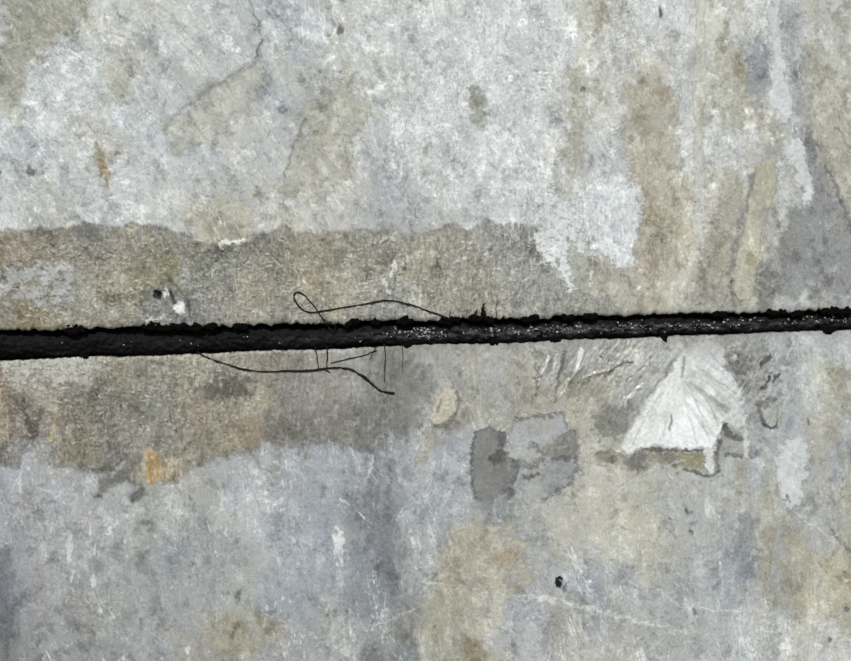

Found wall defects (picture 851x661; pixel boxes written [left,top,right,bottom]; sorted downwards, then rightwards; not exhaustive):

leakage [0,0,616,331]
leakage [0,347,427,586]
flaking render [470,413,581,506]
spalling [596,337,782,493]